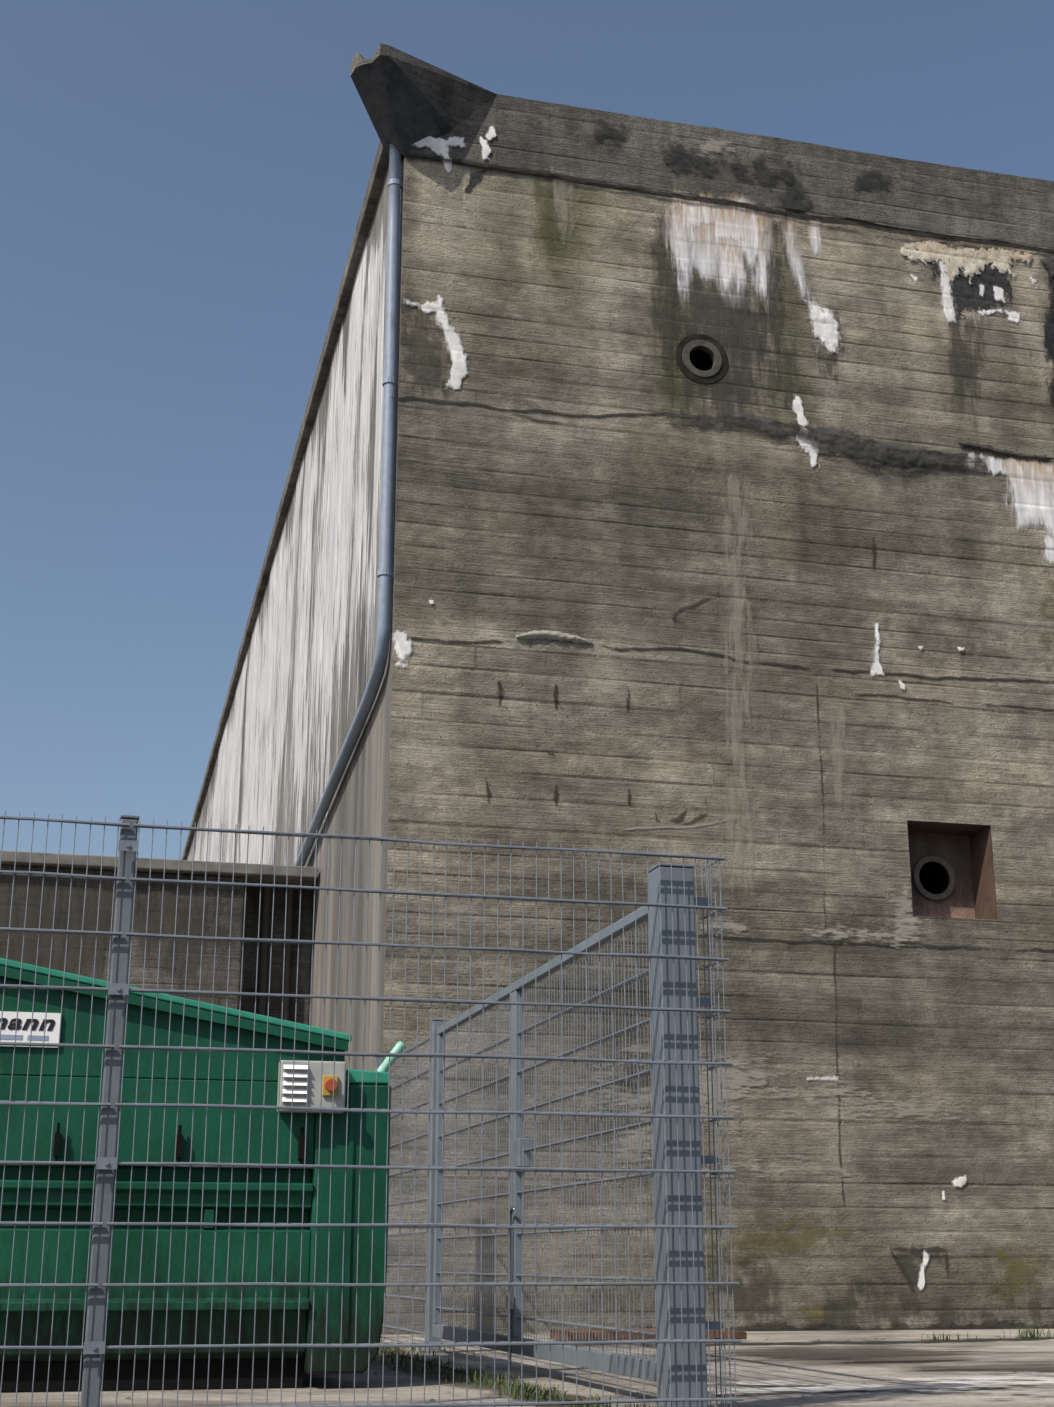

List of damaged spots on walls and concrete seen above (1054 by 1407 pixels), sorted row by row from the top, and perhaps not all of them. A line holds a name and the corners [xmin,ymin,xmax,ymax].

water stain [700,138,734,156]
water stain [652,191,844,467]
spalling [900,239,1054,322]
water stain [1041,260,1054,405]
crack [391,396,712,423]
crack [924,442,1054,462]
water stain [965,453,1054,563]
crack [389,591,1054,850]
crack [695,892,1054,1207]
spalling [890,1246,949,1294]